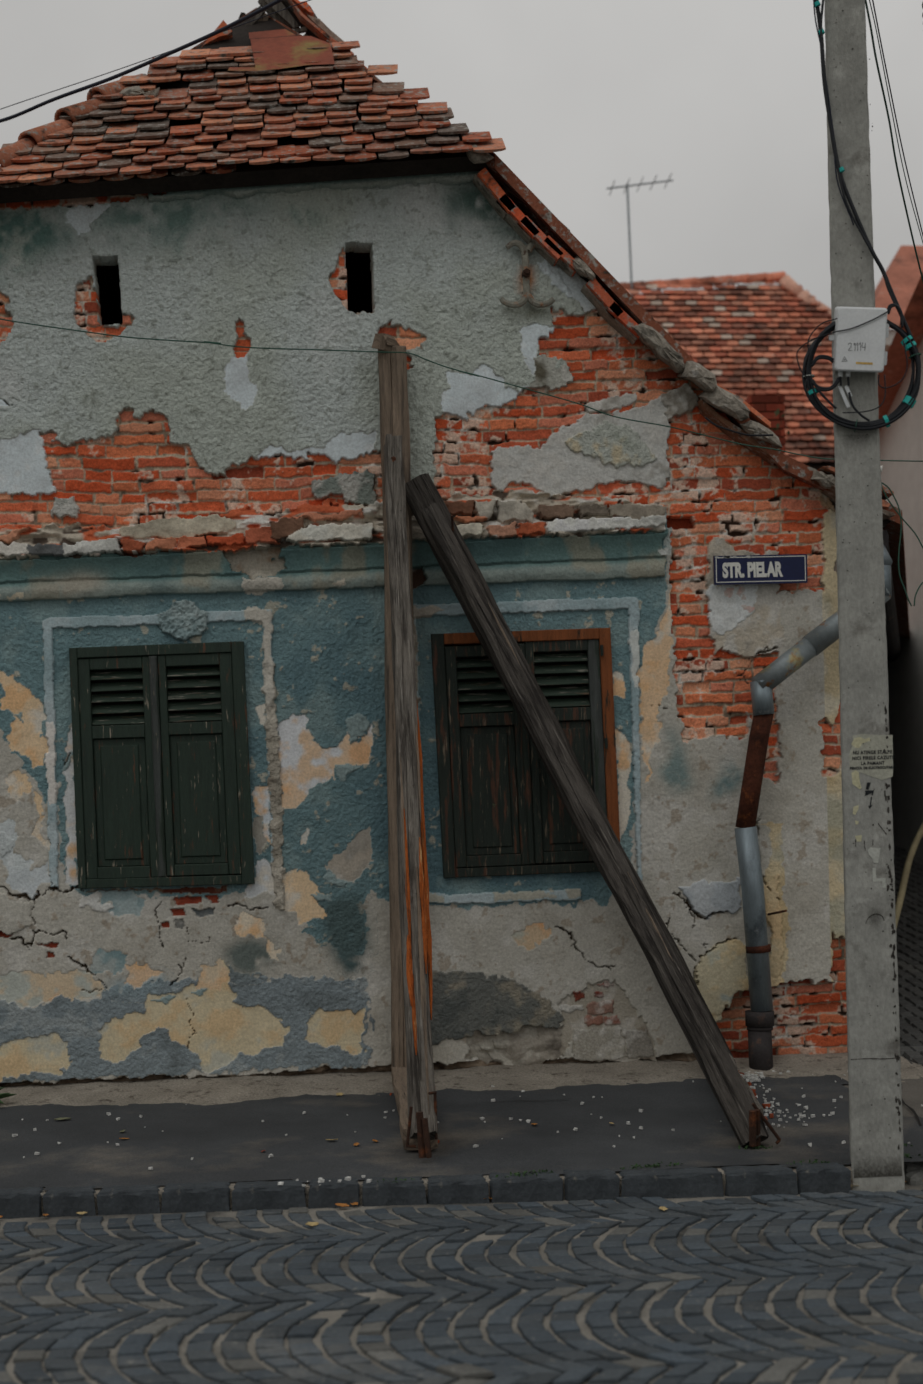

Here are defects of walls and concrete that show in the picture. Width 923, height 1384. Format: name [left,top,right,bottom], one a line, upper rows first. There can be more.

flaking render [75,277,134,342]
flaking render [329,250,426,369]
flaking render [432,259,837,838]
flaking render [0,410,384,960]
rust [735,714,774,828]
flaking render [818,705,888,842]
crack [9,887,89,972]
crack [666,893,727,957]
peeling [0,942,391,1087]
flaking render [431,970,697,1070]
flaking render [716,990,751,1058]
flaking render [772,937,848,1055]